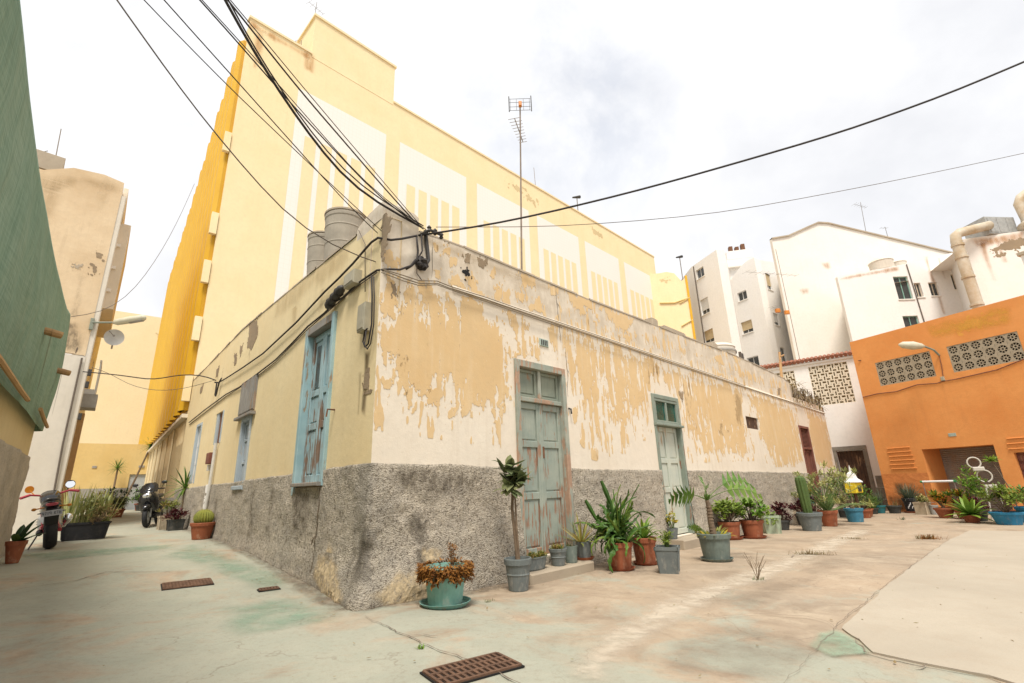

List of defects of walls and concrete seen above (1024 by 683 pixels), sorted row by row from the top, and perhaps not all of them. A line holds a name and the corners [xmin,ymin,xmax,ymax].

spalling [990,237,1024,257]
spalling [234,318,258,366]
peeling [362,213,837,468]